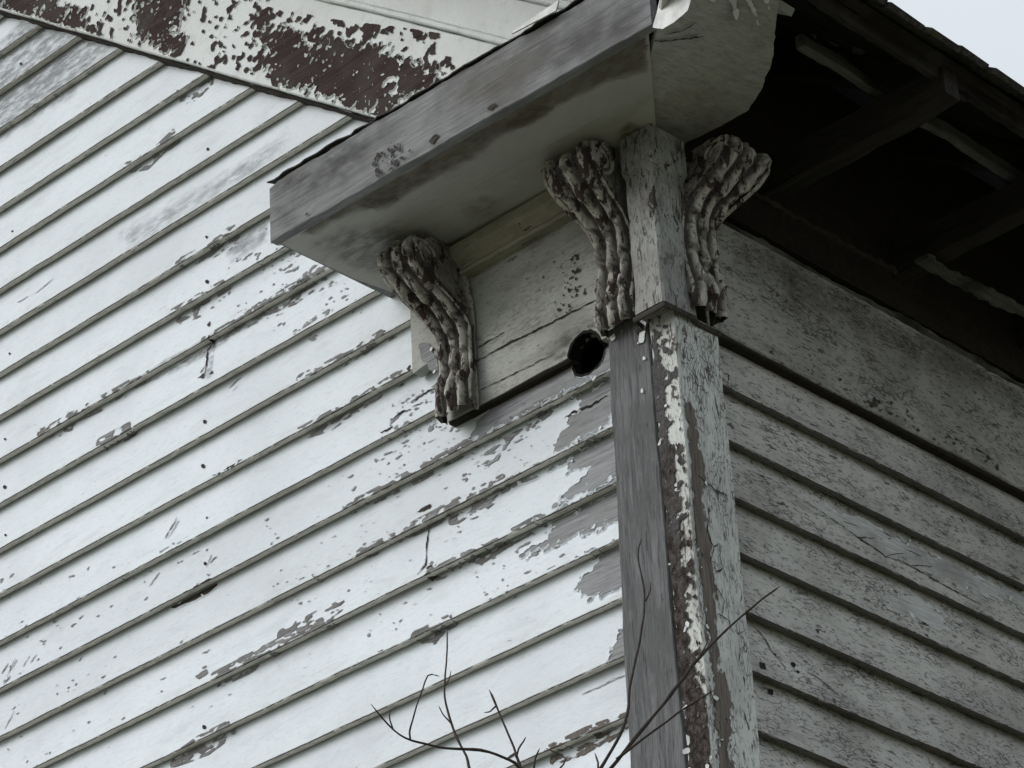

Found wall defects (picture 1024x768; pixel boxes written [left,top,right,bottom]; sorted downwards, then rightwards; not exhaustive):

peeling [0,0,457,117]
crack [200,335,215,378]
peeling [296,329,623,604]
crack [417,520,430,575]
peeling [637,320,735,768]
peeling [166,549,220,613]
spalling [195,564,349,695]
spalling [411,614,458,644]
spalling [170,721,236,767]